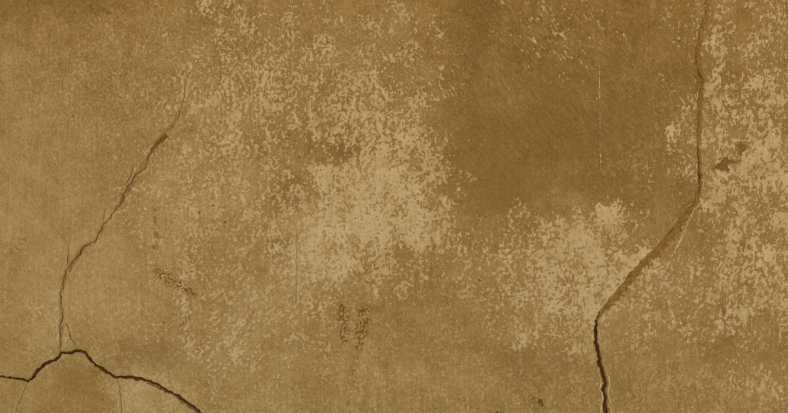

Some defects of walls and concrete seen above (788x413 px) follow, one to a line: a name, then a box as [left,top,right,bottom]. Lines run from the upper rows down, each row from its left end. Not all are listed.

crack [0,90,203,413]
crack [591,0,711,413]